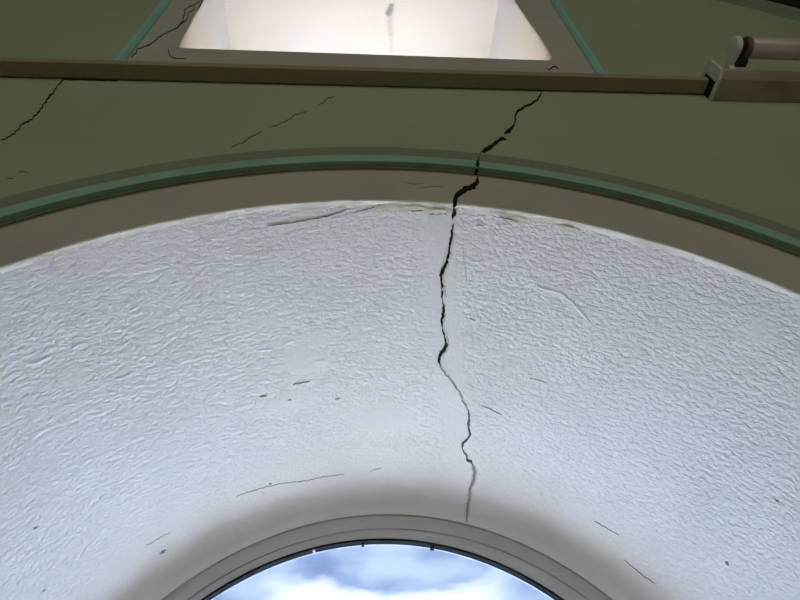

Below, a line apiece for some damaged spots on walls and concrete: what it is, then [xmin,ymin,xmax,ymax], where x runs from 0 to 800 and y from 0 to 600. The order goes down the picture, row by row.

crack [131,0,201,59]
crack [0,78,116,140]
crack [231,96,335,148]
crack [270,207,374,226]
crack [405,91,542,522]